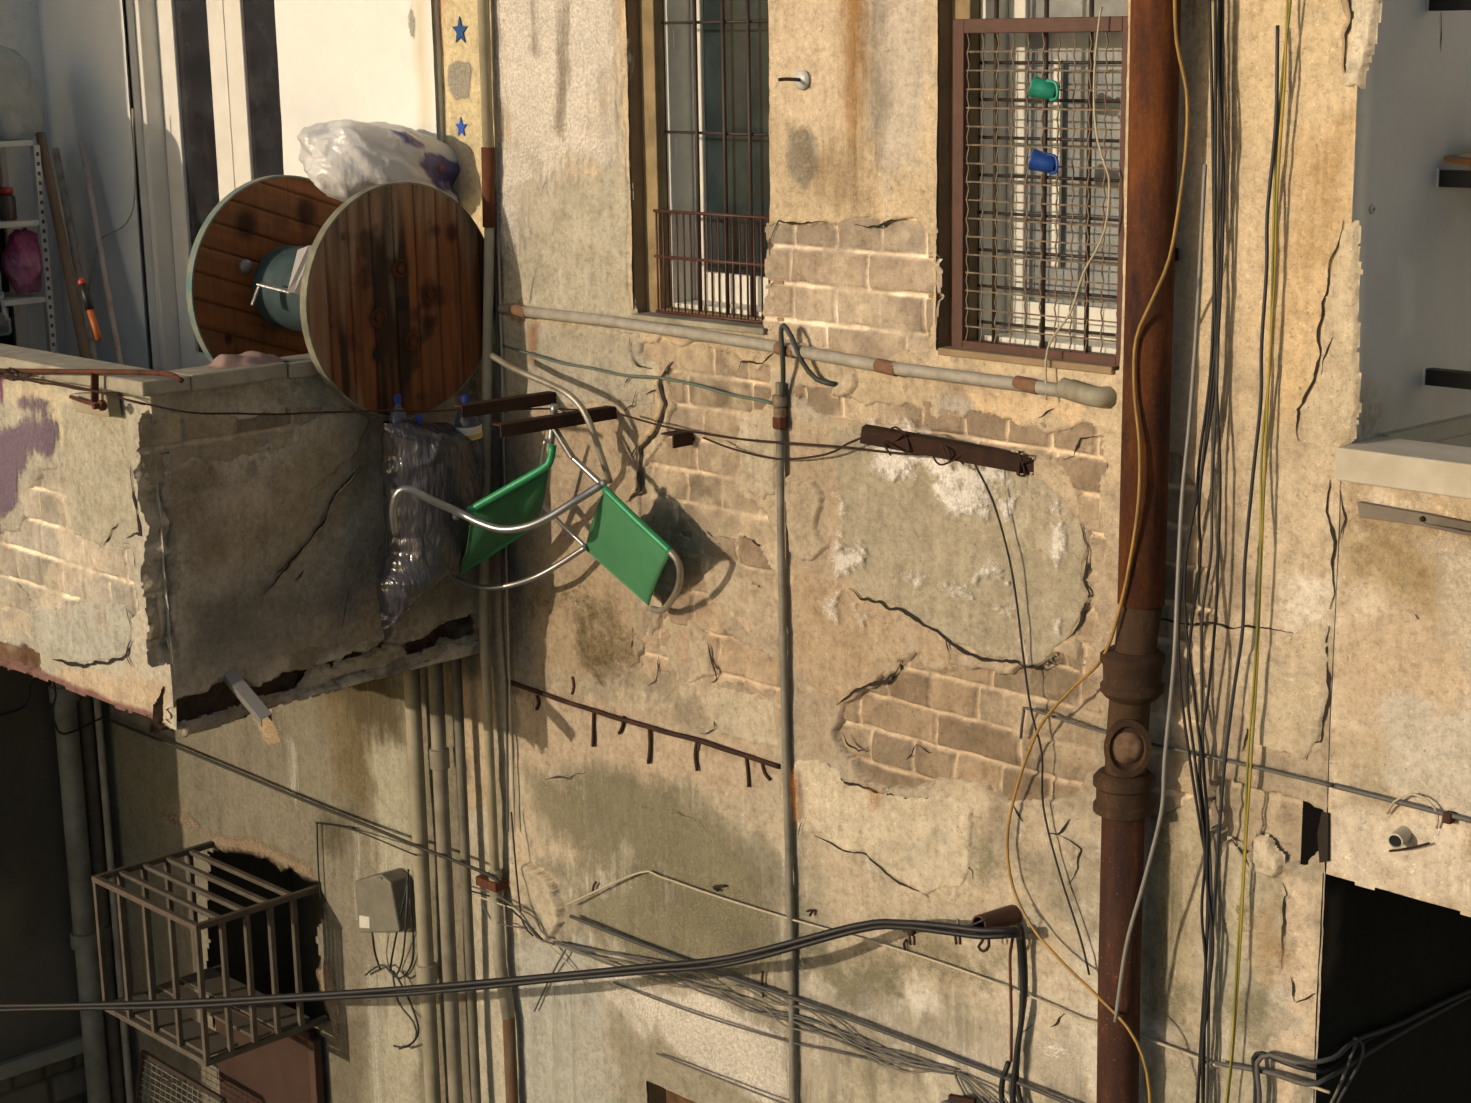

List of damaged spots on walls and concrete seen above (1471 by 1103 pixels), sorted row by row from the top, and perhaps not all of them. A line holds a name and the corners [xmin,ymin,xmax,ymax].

crack [1340,0,1354,85]
crack [623,337,670,502]
crack [1296,221,1344,441]
peeling [0,405,480,738]
crack [261,464,360,597]
spalling [508,216,1107,895]
crack [850,524,1090,670]
spalling [1146,451,1218,816]
water stain [531,769,772,981]
peeling [1209,779,1303,969]
water stain [604,947,1080,1103]